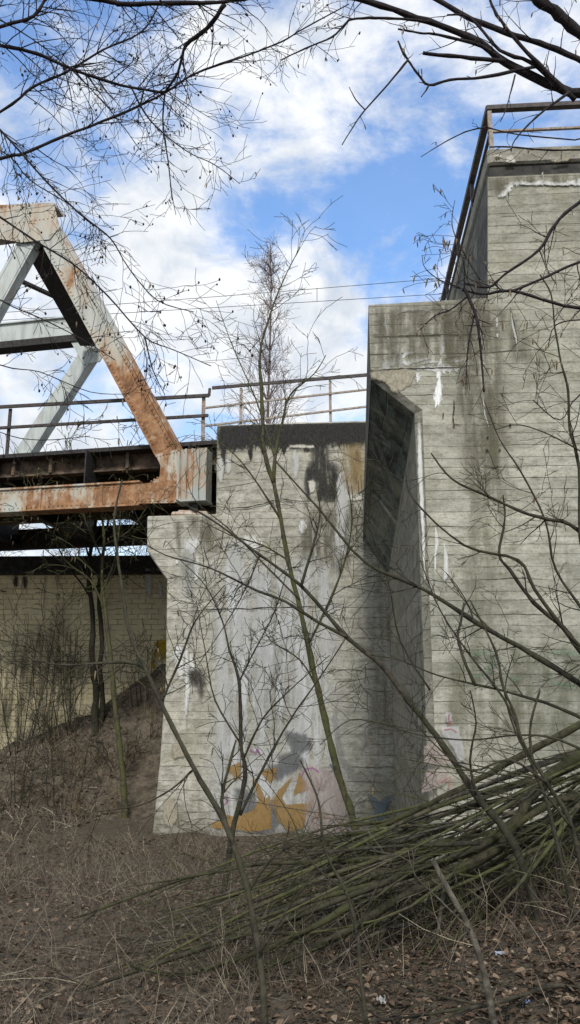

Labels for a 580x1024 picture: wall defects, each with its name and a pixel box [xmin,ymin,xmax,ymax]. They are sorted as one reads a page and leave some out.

damp [490,172,580,197]
damp [172,518,271,780]
efflorescence [217,455,231,482]
damp [293,446,360,728]
efflorescence [417,424,449,580]
damp [377,303,499,486]